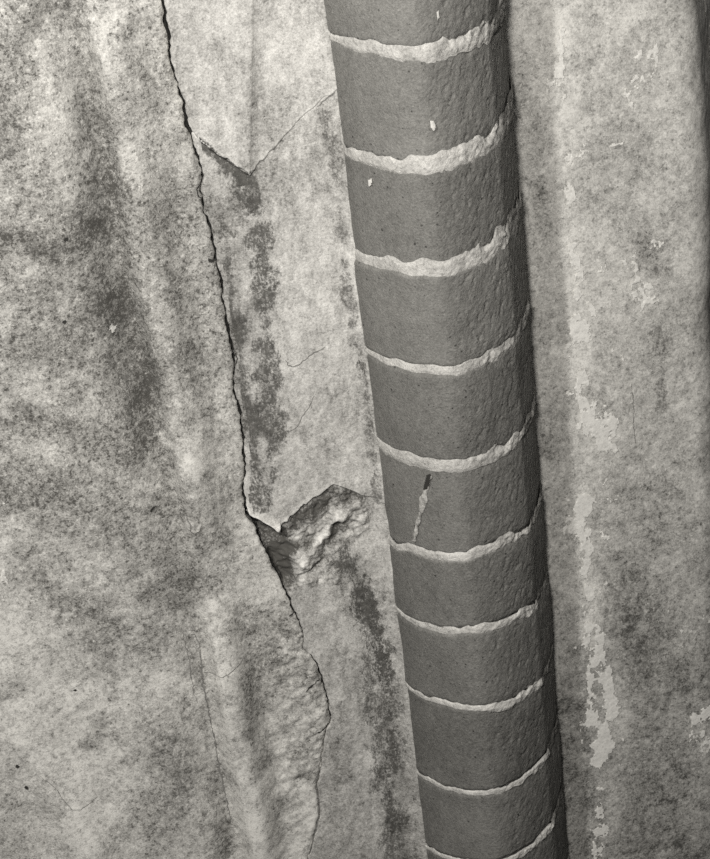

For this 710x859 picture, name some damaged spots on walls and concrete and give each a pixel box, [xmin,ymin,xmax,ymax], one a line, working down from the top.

leakage [199,137,288,514]
crack [161,0,331,854]
flaking render [246,484,372,592]
leakage [331,540,408,859]
peeling [563,493,624,769]
peeling [688,705,710,753]